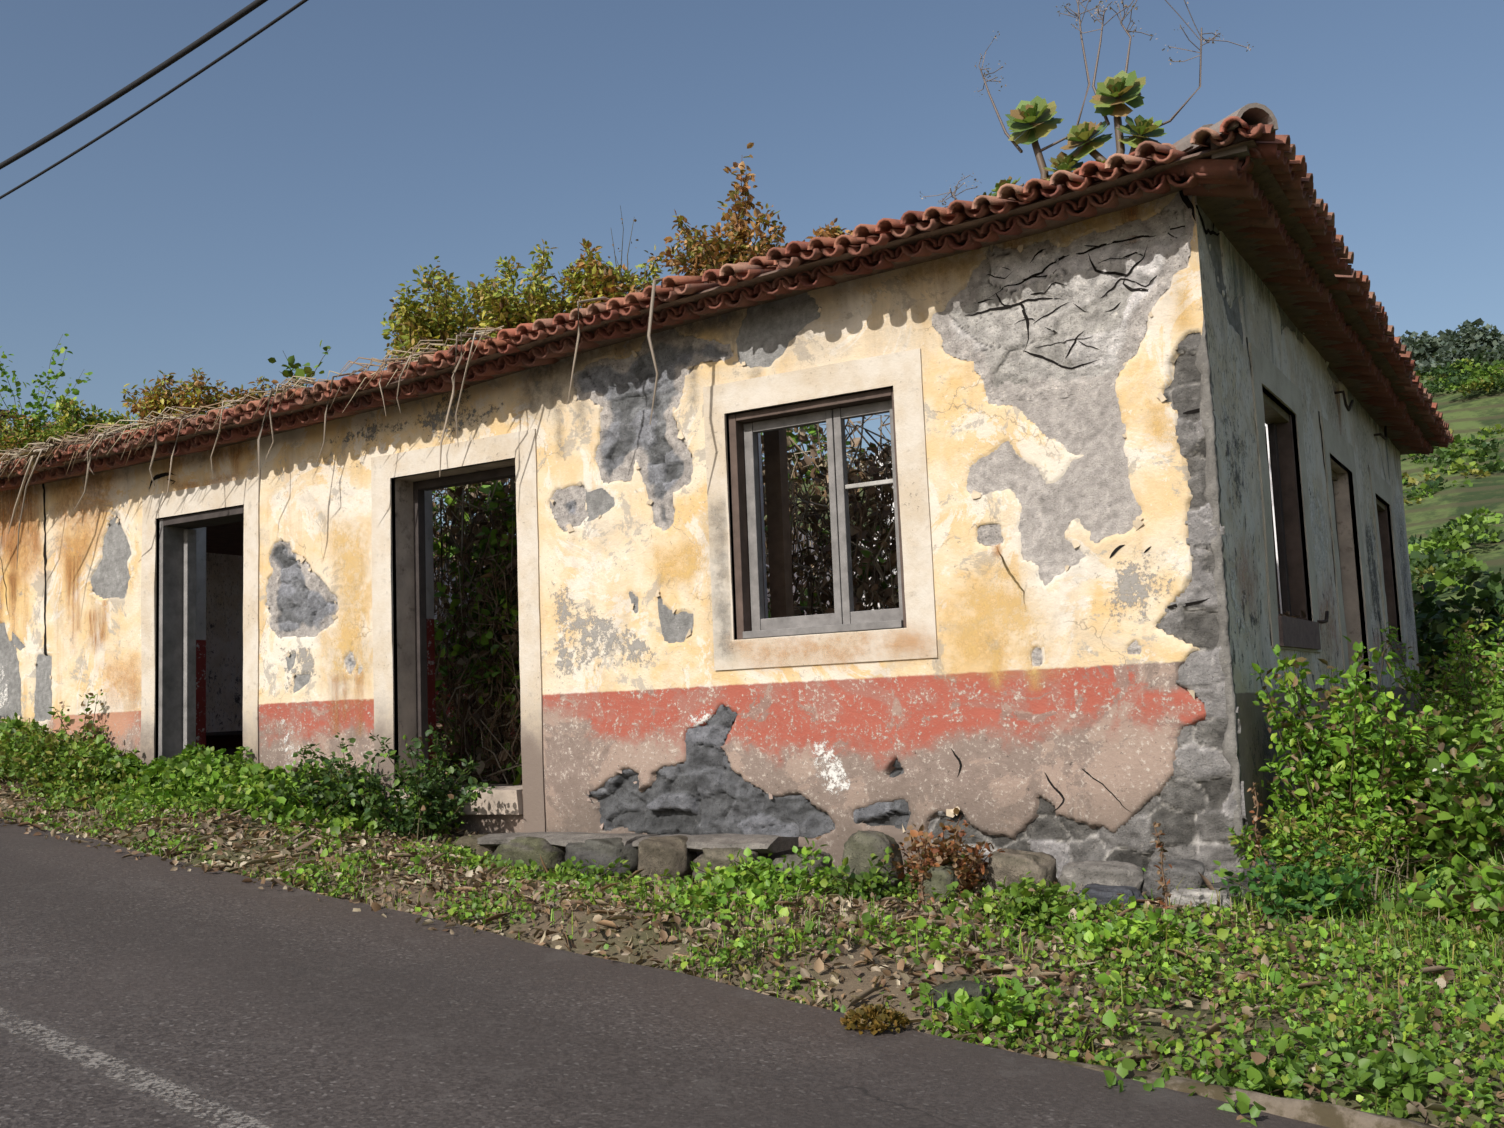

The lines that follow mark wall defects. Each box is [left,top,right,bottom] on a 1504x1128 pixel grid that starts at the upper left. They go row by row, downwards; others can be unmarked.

crack [965,190,1220,369]
spalling [550,292,822,532]
spalling [931,192,1244,586]
flaking render [0,622,52,721]
flaking render [90,514,132,599]
spalling [265,537,339,693]
peeling [552,584,694,678]
spalling [928,332,1250,883]
spalling [587,705,835,838]
peeling [813,740,852,793]
spalling [853,799,911,833]